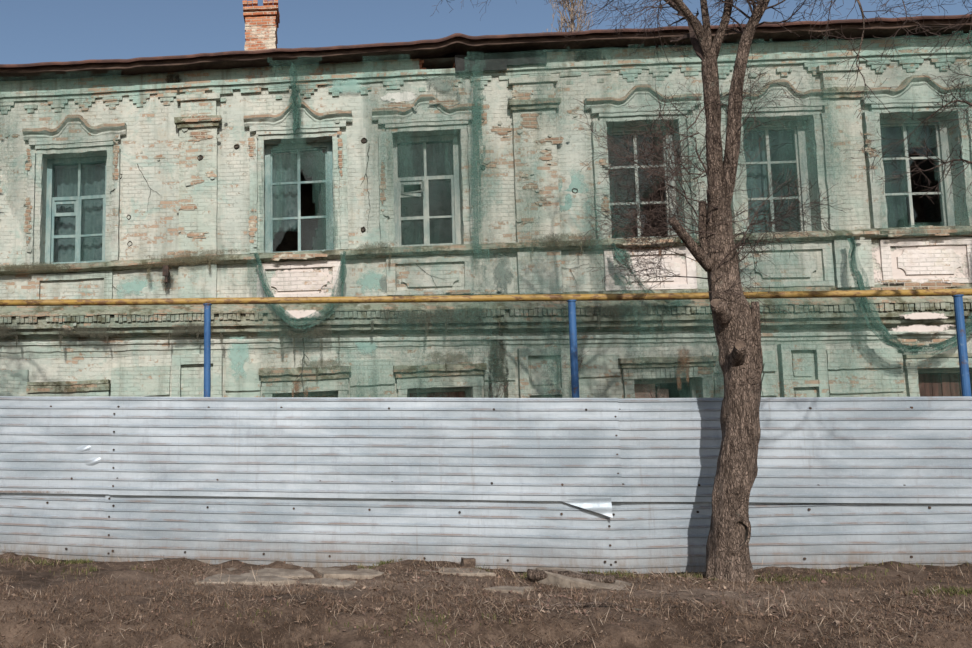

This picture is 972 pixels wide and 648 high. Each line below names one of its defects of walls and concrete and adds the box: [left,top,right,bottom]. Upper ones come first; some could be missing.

spalling [479,96,571,164]
spalling [21,197,32,252]
spalling [178,230,209,239]